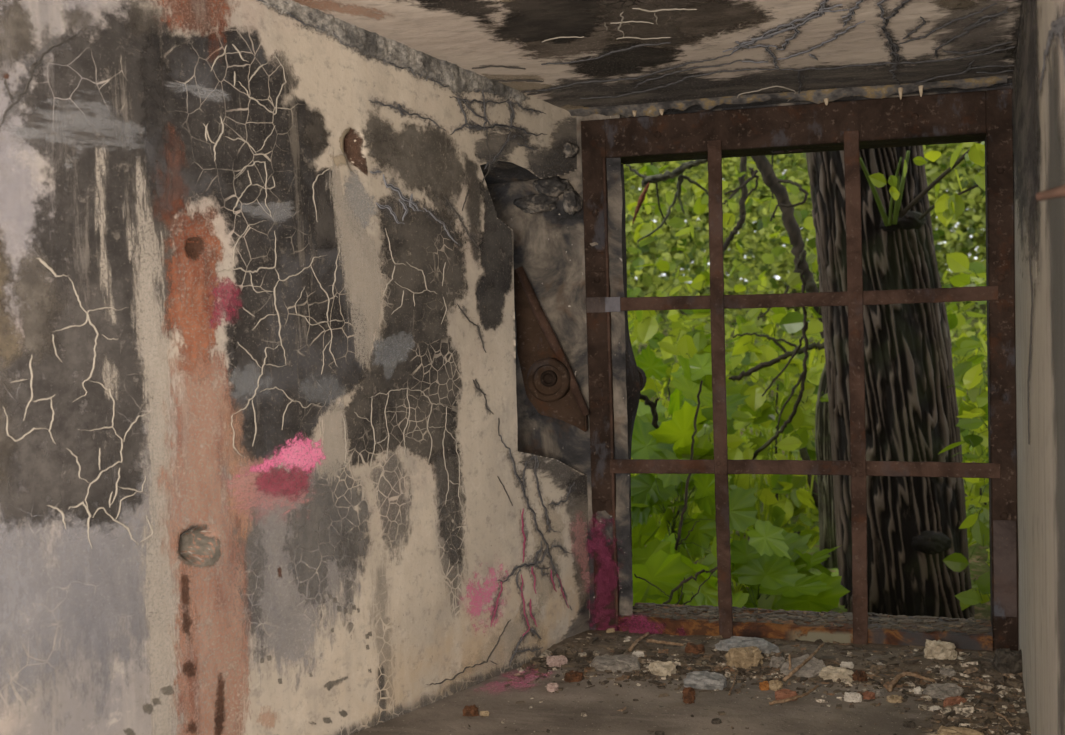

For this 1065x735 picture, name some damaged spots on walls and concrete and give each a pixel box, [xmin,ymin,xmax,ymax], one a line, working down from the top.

crack [0,30,81,127]
crack [3,258,153,549]
leakage [0,0,468,735]
crack [203,44,465,516]
rust [344,128,368,175]
crack [430,379,575,685]
leakage [398,0,774,78]
crack [258,0,1015,353]
crack [1026,255,1034,444]
crack [1039,8,1065,90]